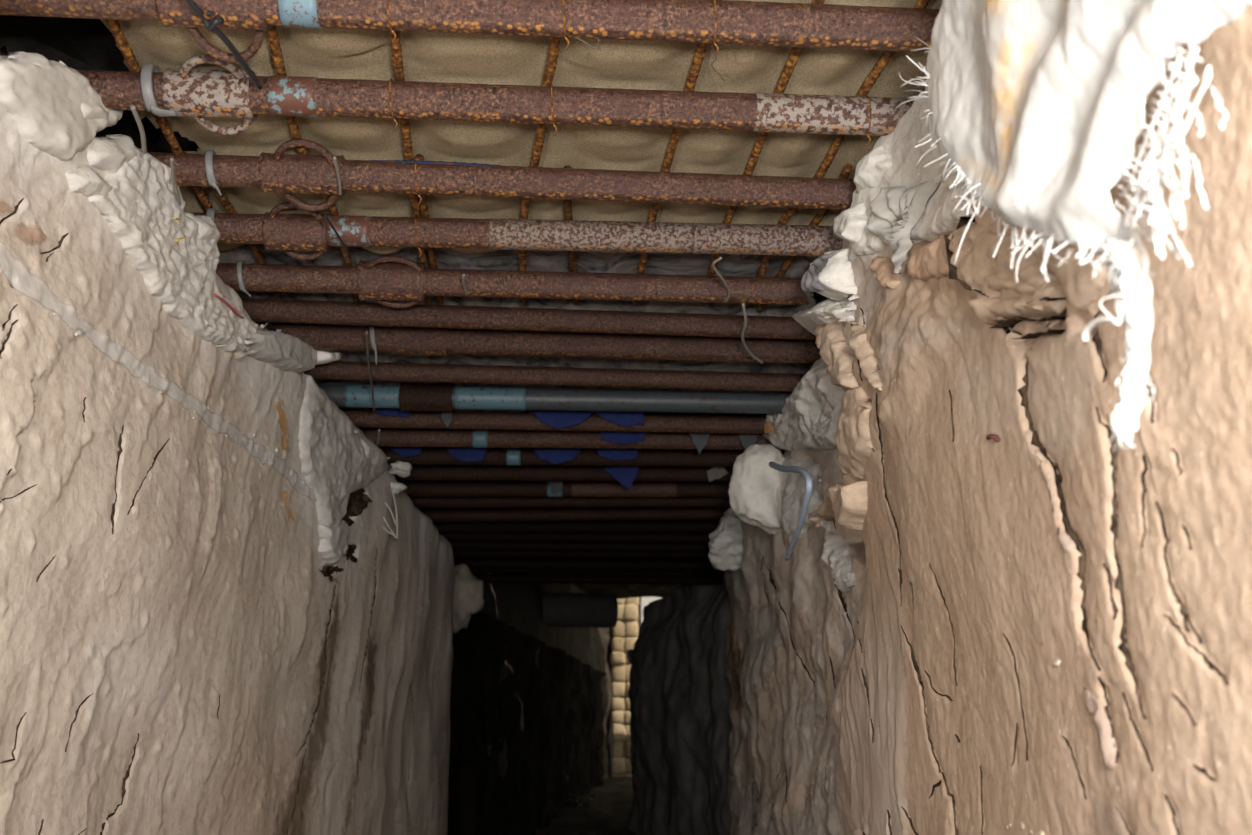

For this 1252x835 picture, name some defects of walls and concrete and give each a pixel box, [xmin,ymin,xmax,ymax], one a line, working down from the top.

crack [0,198,24,224]
crack [39,233,69,262]
crack [0,282,19,359]
crack [0,469,37,502]
crack [110,425,170,534]
spalling [1035,456,1075,555]
crack [943,217,1230,835]
crack [857,359,1029,835]
crack [1,712,27,763]
crack [65,693,94,752]
spalling [1084,686,1119,770]
crack [78,733,139,835]